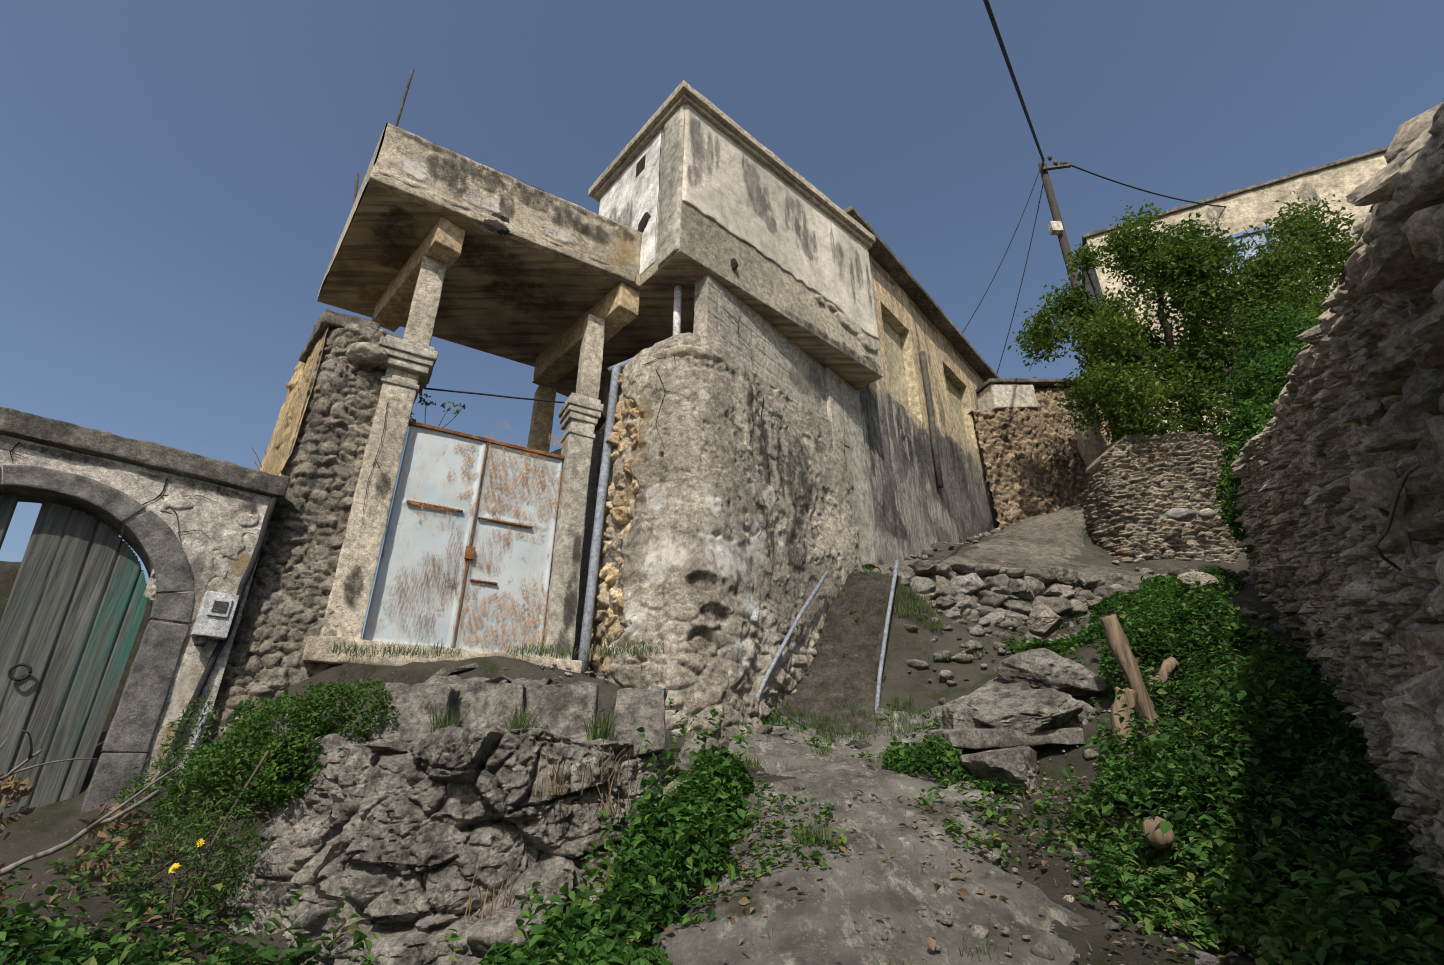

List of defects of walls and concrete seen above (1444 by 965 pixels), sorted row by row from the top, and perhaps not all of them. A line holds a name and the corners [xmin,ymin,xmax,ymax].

damp [462,239,561,313]
damp [395,133,635,265]
damp [688,119,720,185]
damp [742,156,894,303]
damp [910,301,984,488]
rust [374,435,566,656]
spalling [585,373,644,681]
damp [625,470,668,520]
damp [640,383,820,621]
damp [608,606,646,660]
damp [727,635,755,668]